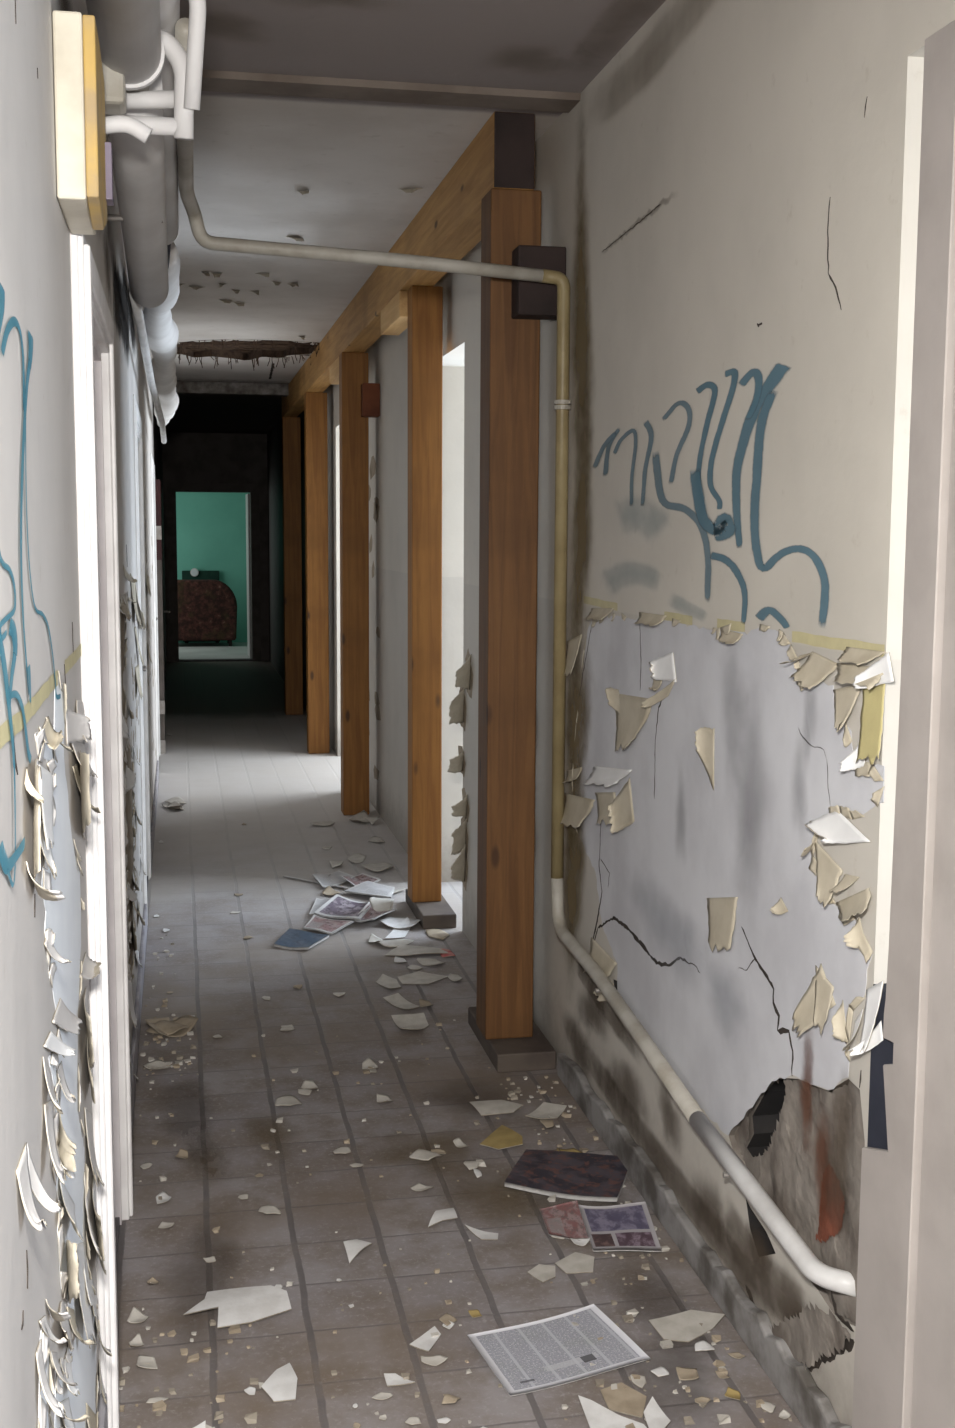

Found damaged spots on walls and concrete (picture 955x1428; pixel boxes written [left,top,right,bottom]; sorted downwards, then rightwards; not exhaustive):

peeling [179,272,299,306]
spalling [177,336,320,370]
crack [603,204,661,251]
crack [827,197,841,309]
peeling [120,565,155,1028]
peeling [16,671,112,1428]
crack [593,827,700,973]
peeling [560,608,894,1323]
crack [739,928,794,1074]